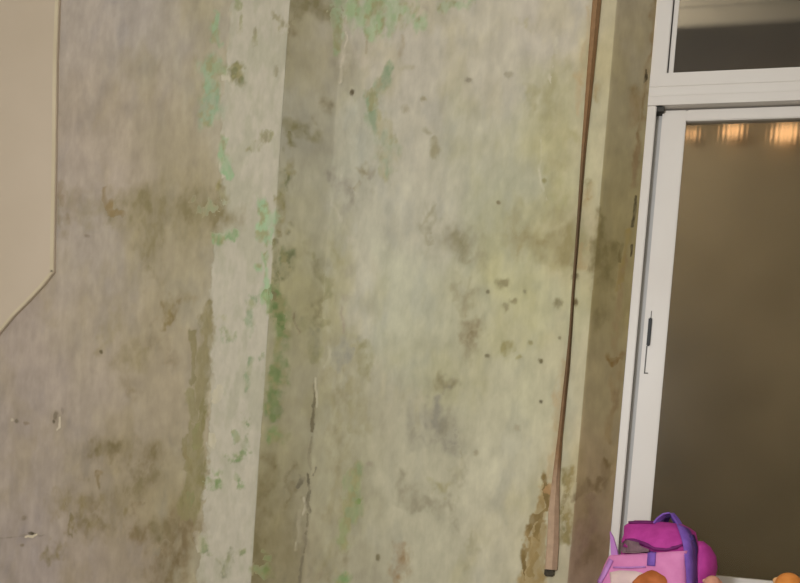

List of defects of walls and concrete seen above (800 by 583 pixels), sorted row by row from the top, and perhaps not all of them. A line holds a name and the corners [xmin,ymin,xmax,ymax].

damp [38,151,255,583]
peeling [188,0,299,583]
crack [295,382,318,583]
peeling [326,0,478,185]
damp [415,46,624,369]
damp [564,456,614,577]